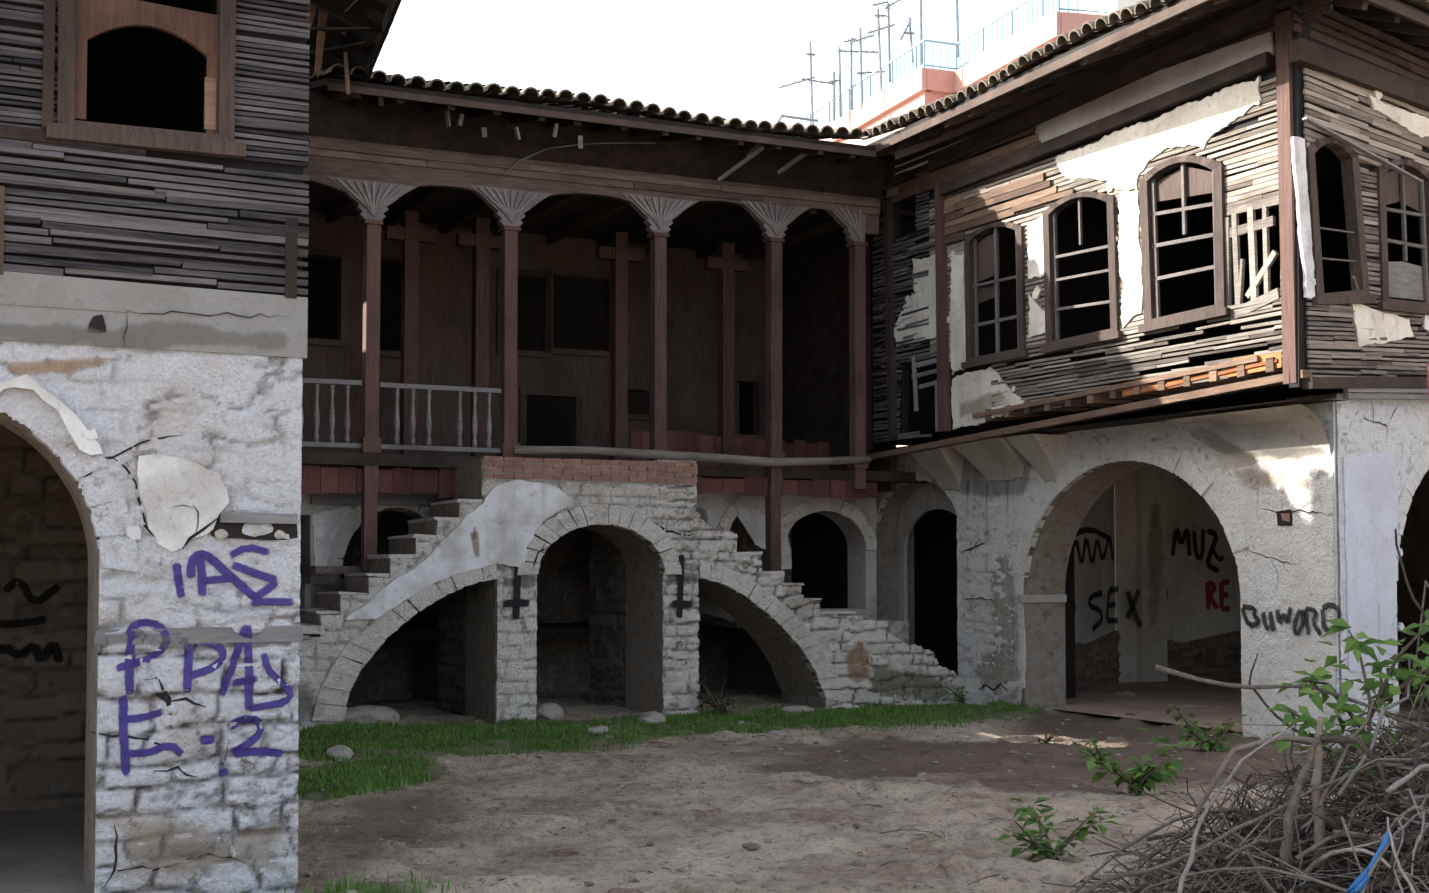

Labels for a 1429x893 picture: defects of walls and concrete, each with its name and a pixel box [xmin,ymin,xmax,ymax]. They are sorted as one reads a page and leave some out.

peeling [1367,90,1429,138]
peeling [1035,32,1275,328]
peeling [1291,136,1316,299]
crack [123,310,286,347]
peeling [1350,304,1429,347]
peeling [0,374,103,456]
peeling [125,454,361,582]
spalling [972,574,1026,695]